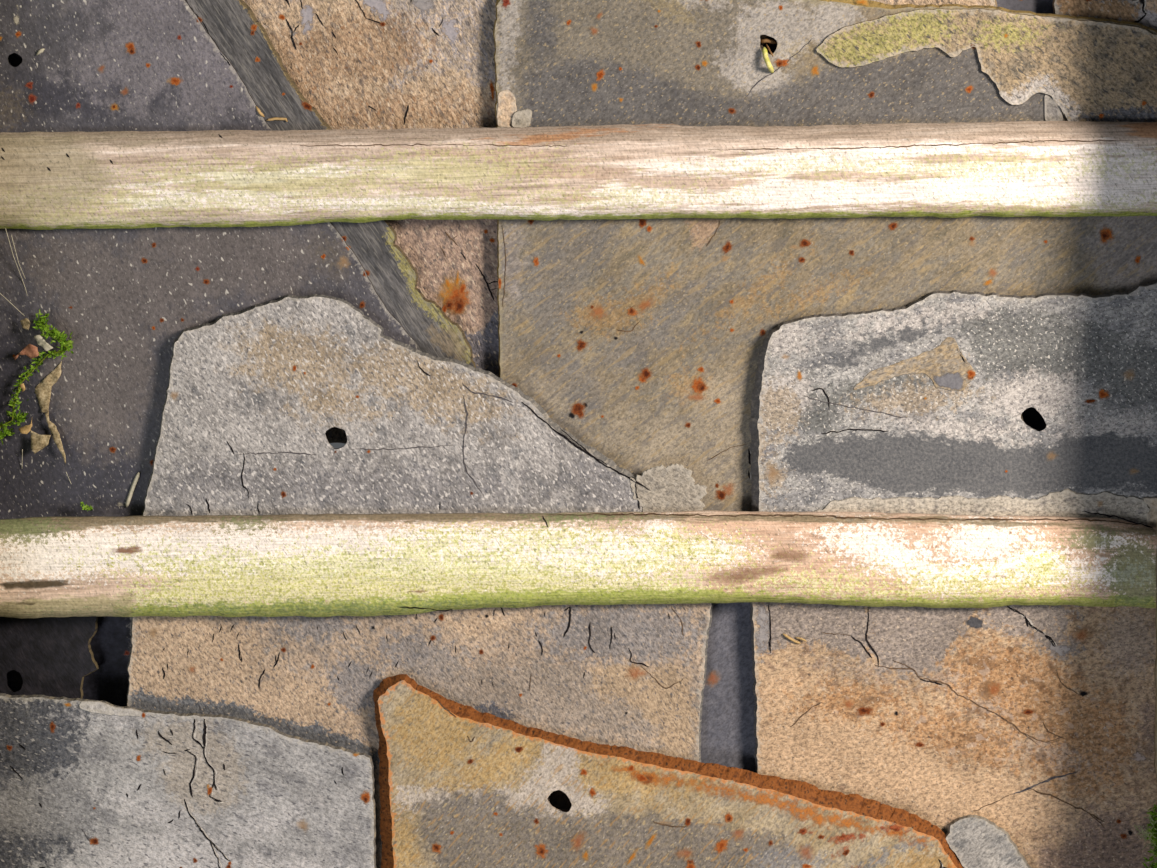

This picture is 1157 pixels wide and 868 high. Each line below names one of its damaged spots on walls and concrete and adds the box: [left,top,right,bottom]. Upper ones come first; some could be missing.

rust [571,403,585,418]
rust [635,368,651,390]
rust [692,367,721,404]
crack [825,609,1065,744]
crack [1007,606,1079,695]
rust [857,707,885,726]
crack [126,719,230,868]
rust [614,765,903,857]
crack [973,772,1104,827]
rust [535,844,548,858]